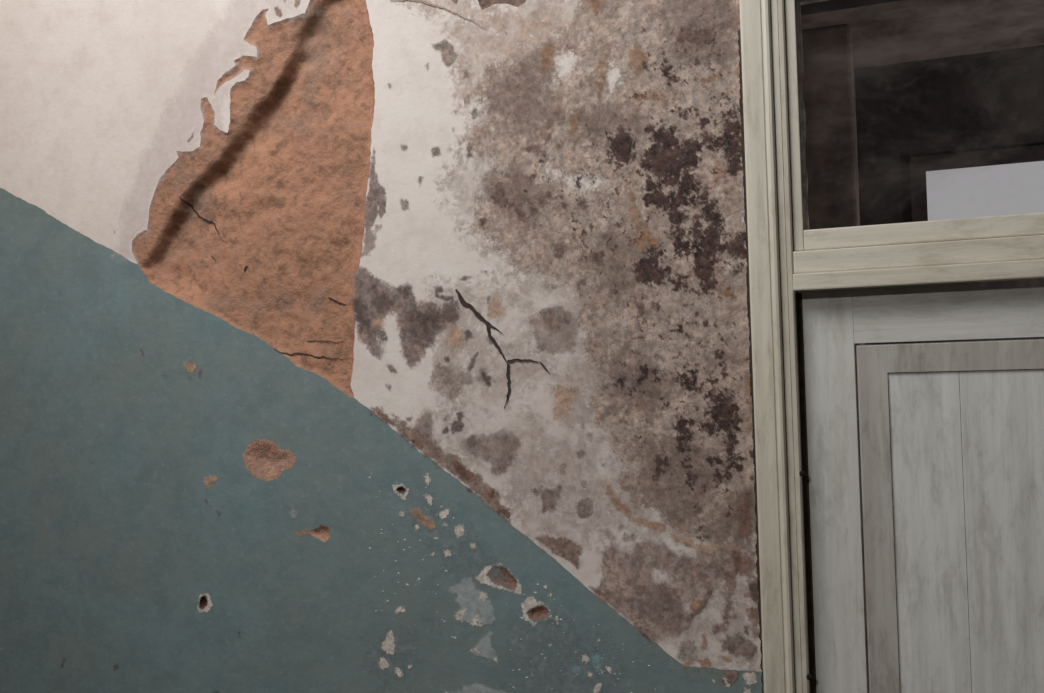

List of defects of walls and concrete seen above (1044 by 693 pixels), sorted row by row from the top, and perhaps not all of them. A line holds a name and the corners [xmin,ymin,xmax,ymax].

damp [433,40,457,66]
flaking render [478,0,526,10]
flaking render [132,0,375,397]
damp [362,151,386,255]
damp [352,268,491,397]
crack [455,289,549,409]
damp [459,0,757,667]
peeling [242,438,296,481]
damp [407,412,518,472]
peeling [295,524,331,542]
peeling [449,563,559,663]
peeling [573,654,616,693]